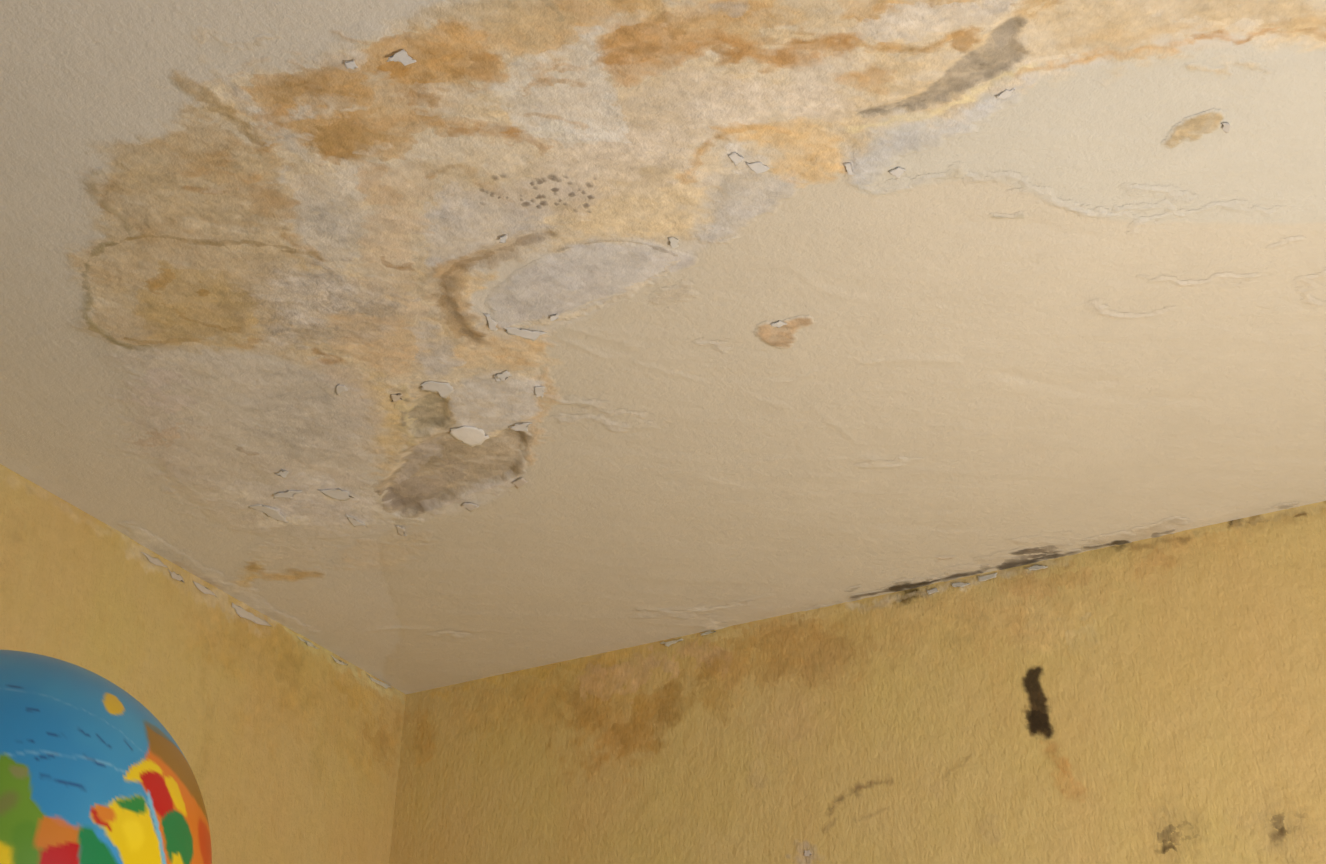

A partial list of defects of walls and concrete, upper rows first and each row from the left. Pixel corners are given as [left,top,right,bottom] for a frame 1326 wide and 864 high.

peeling [387,49,416,66]
peeling [838,14,1044,189]
peeling [1161,108,1230,149]
peeling [483,236,700,341]
leakage [51,0,1326,590]
peeling [753,315,817,350]
flaking render [370,369,548,536]
leakage [166,501,1326,812]